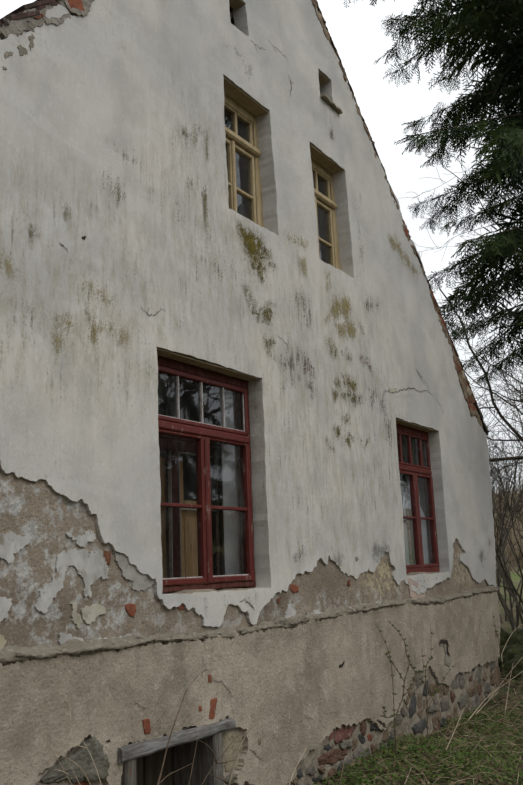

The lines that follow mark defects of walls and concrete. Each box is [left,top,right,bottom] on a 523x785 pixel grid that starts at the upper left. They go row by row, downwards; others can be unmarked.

spalling [3,35,35,70]
flaking render [0,531,31,564]
flaking render [34,530,112,644]
flaking render [0,597,12,625]
flaking render [125,603,136,618]
flaking render [276,597,296,619]